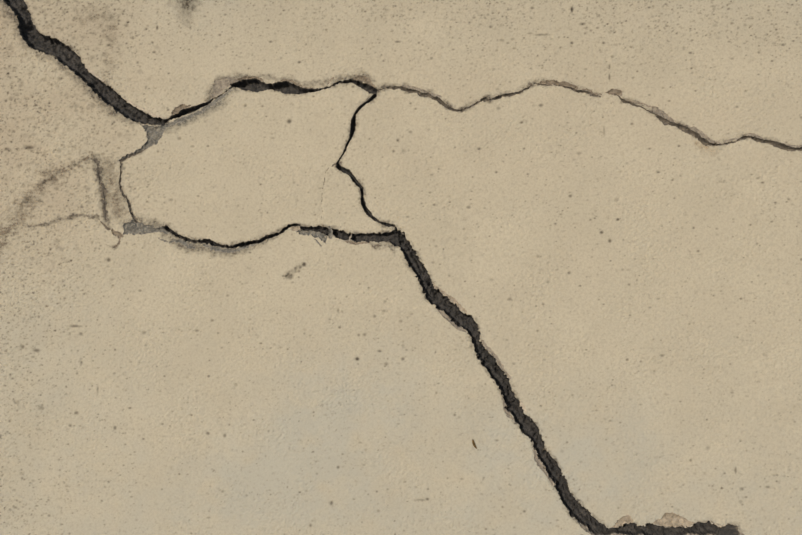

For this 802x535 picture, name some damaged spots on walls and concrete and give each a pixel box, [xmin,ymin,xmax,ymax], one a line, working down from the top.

crack [3,0,601,249]
crack [615,94,802,151]
crack [397,230,744,535]